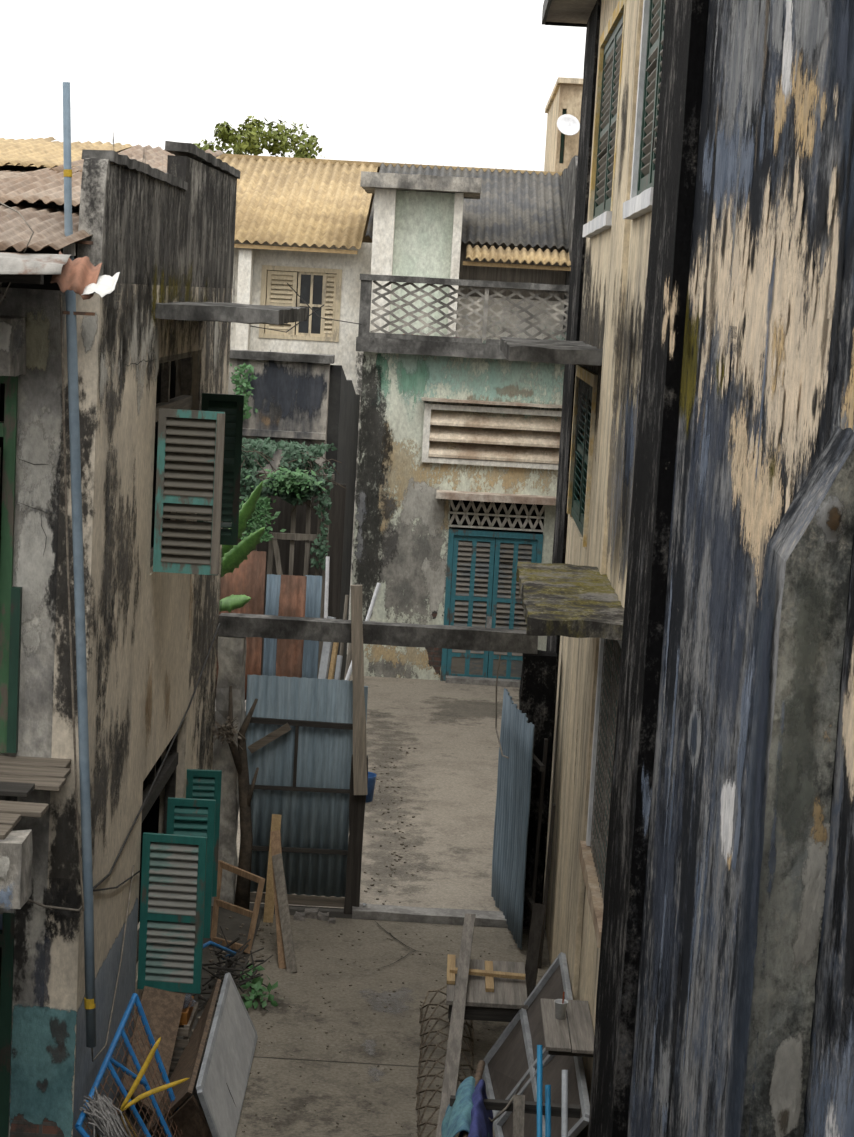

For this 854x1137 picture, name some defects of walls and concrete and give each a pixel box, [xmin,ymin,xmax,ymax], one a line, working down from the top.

peeling [662,48,845,606]
peeling [833,328,854,431]
water stain [351,352,430,621]
water stain [13,154,237,1007]
peeling [823,646,854,801]
peeling [791,798,830,972]
flaking render [10,1113,64,1137]
flaking render [46,1018,69,1063]
peeling [769,1033,803,1137]